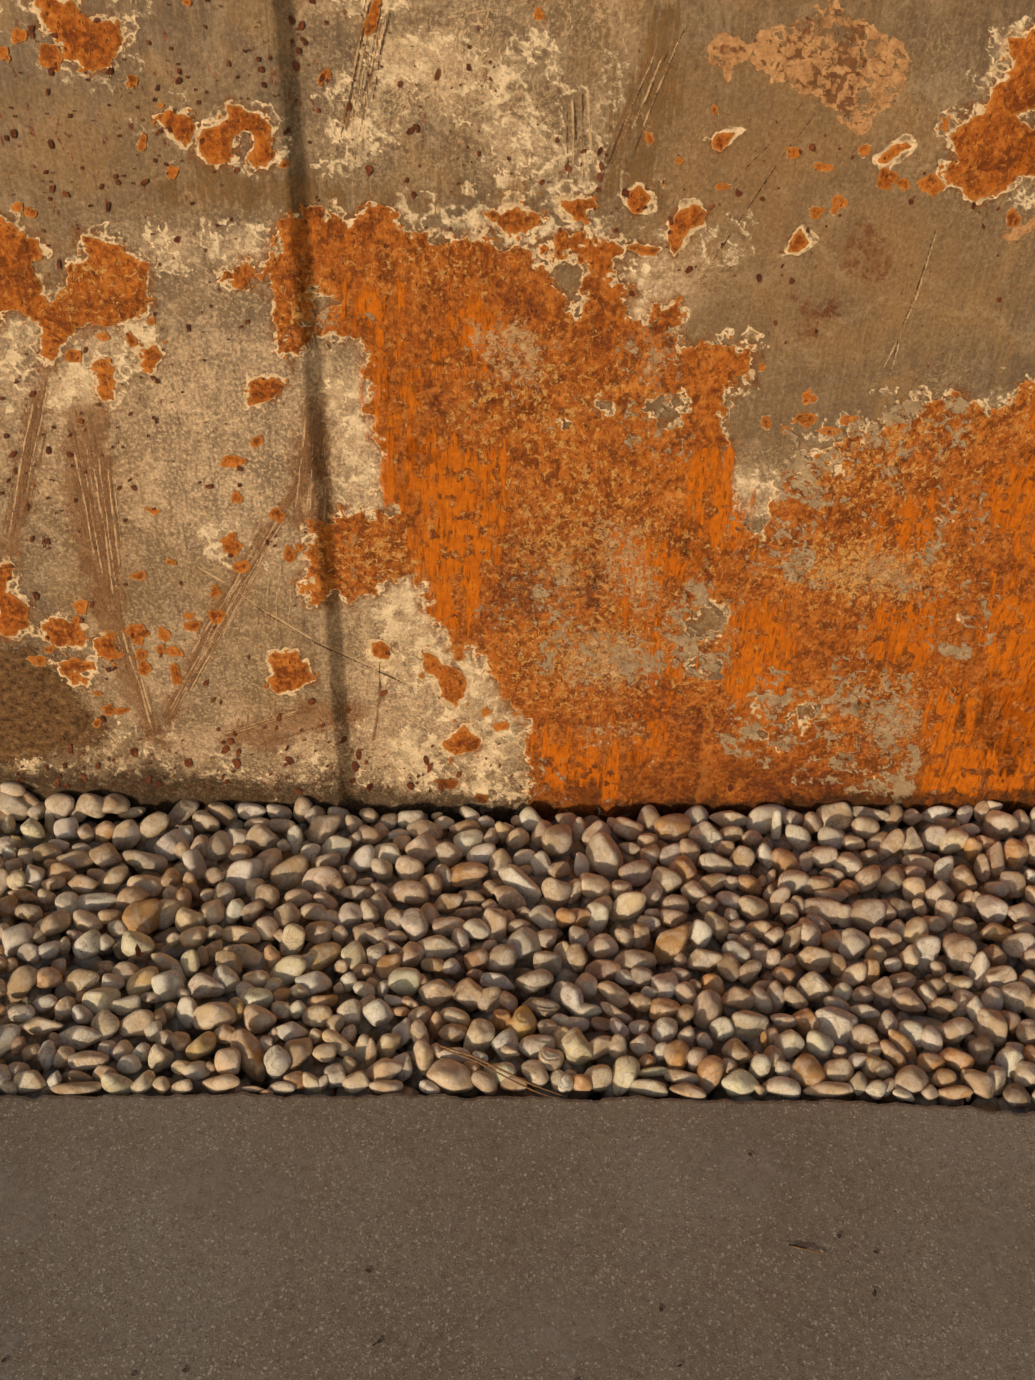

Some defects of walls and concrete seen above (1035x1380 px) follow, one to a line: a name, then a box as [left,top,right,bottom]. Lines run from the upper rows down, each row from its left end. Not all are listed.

peeling [706,0,913,135]
peeling [965,15,1030,91]
peeling [1001,176,1035,243]
corrosion [0,0,1035,829]